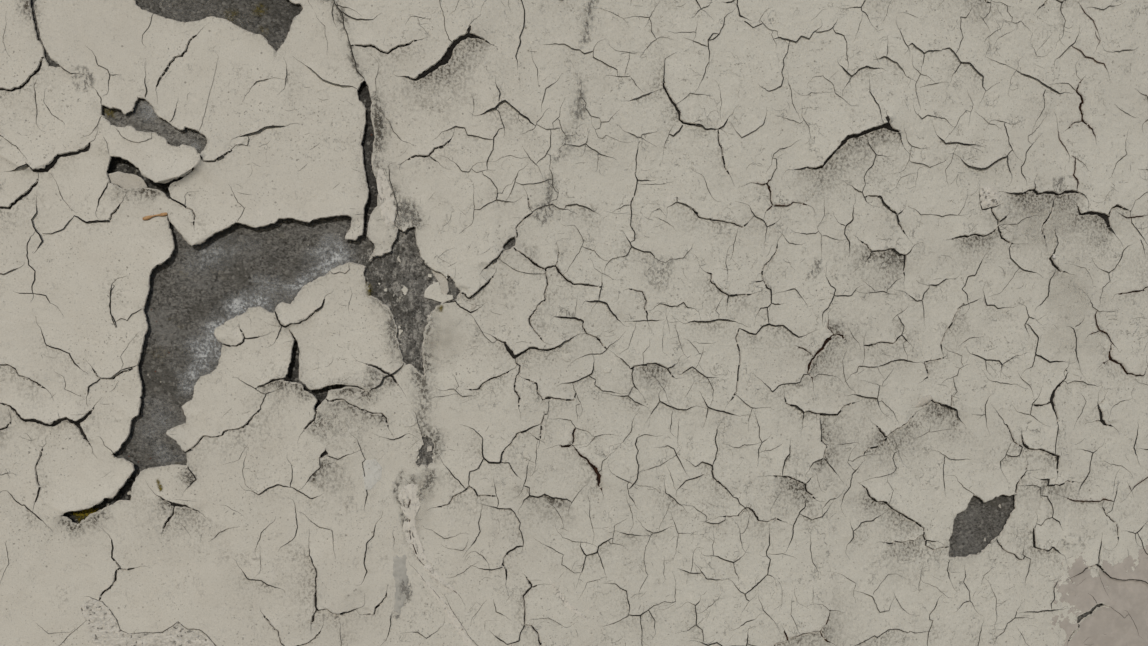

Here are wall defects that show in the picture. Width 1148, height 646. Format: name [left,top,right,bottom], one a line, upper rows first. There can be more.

peeling [135,0,303,52]
peeling [102,98,207,154]
peeling [106,157,194,199]
crack [0,25,218,532]
crack [222,269,352,348]
crack [242,0,1148,646]
peeling [63,215,460,524]
crack [146,376,290,542]
crack [86,526,216,646]
crack [234,516,285,592]
peeling [949,495,1015,557]
peeling [1077,603,1103,623]